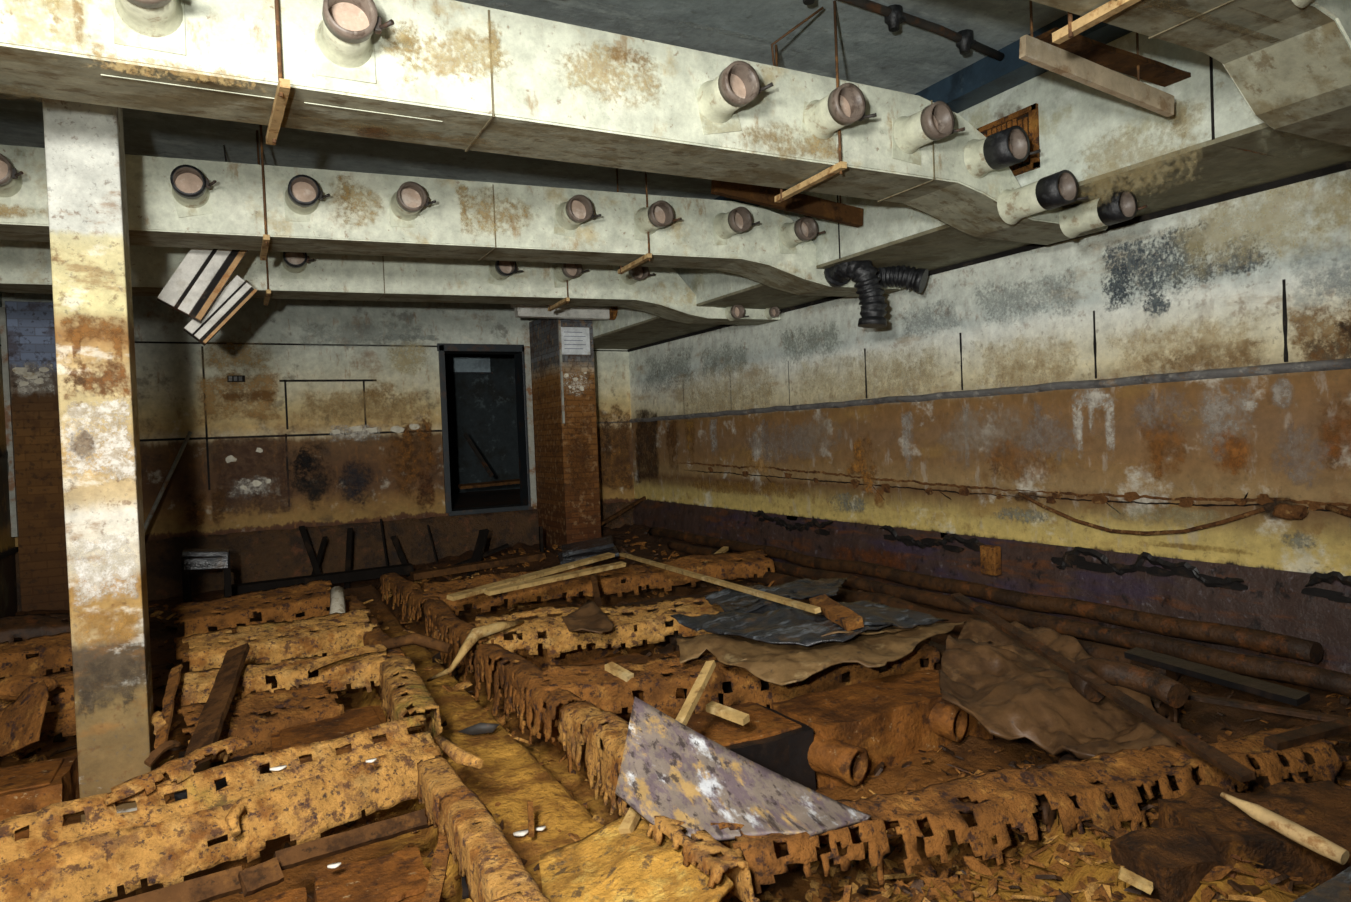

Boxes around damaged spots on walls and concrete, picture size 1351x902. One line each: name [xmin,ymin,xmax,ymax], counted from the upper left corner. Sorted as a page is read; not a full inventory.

mould [1103,219,1269,316]
corrosion [61,315,129,398]
water stain [212,436,372,522]
corrosion [389,420,436,508]